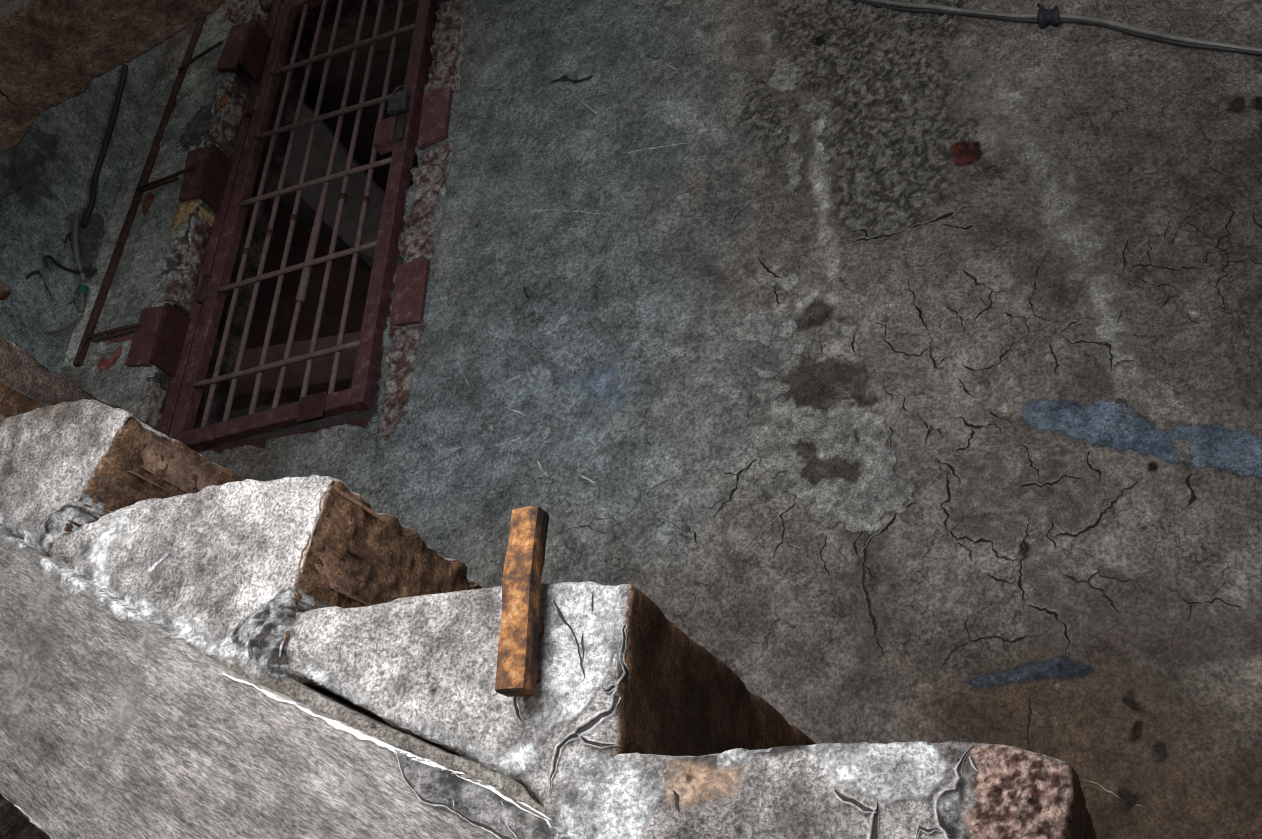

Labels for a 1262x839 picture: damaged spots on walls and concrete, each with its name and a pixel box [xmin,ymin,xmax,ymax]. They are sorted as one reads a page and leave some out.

spalling [427,0,470,92]
spalling [400,141,456,263]
crack [840,203,1016,247]
crack [1122,196,1262,324]
spalling [378,322,425,439]
crack [685,459,757,544]
crack [770,257,1243,668]
crack [548,594,630,792]
peeling [568,751,662,839]
peeling [683,742,945,803]
crack [833,745,979,839]
spalling [964,744,1084,839]